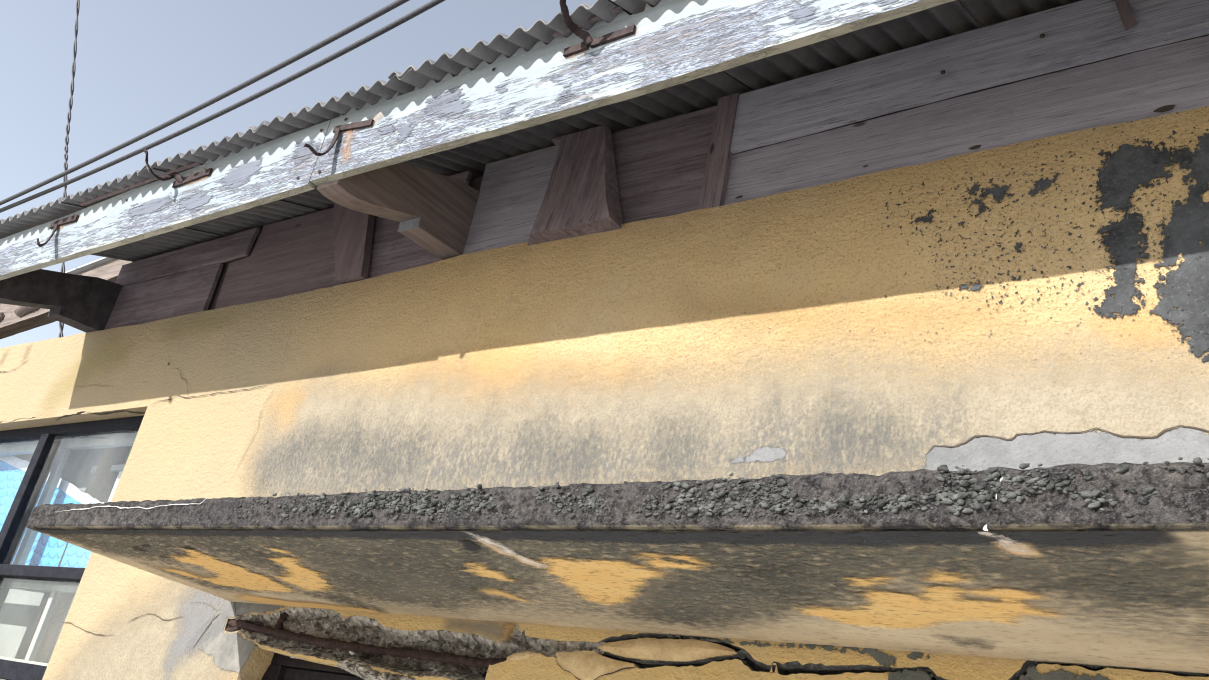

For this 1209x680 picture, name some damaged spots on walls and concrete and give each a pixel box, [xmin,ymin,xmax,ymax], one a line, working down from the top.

peeling [881,127,1209,363]
crack [0,323,292,480]
damp [252,353,1209,498]
peeling [924,427,1209,471]
crack [60,498,207,512]
spalling [198,600,638,680]
damp [35,525,1209,680]
crack [555,633,948,680]
peeling [1017,665,1108,680]
crack [1008,660,1209,680]